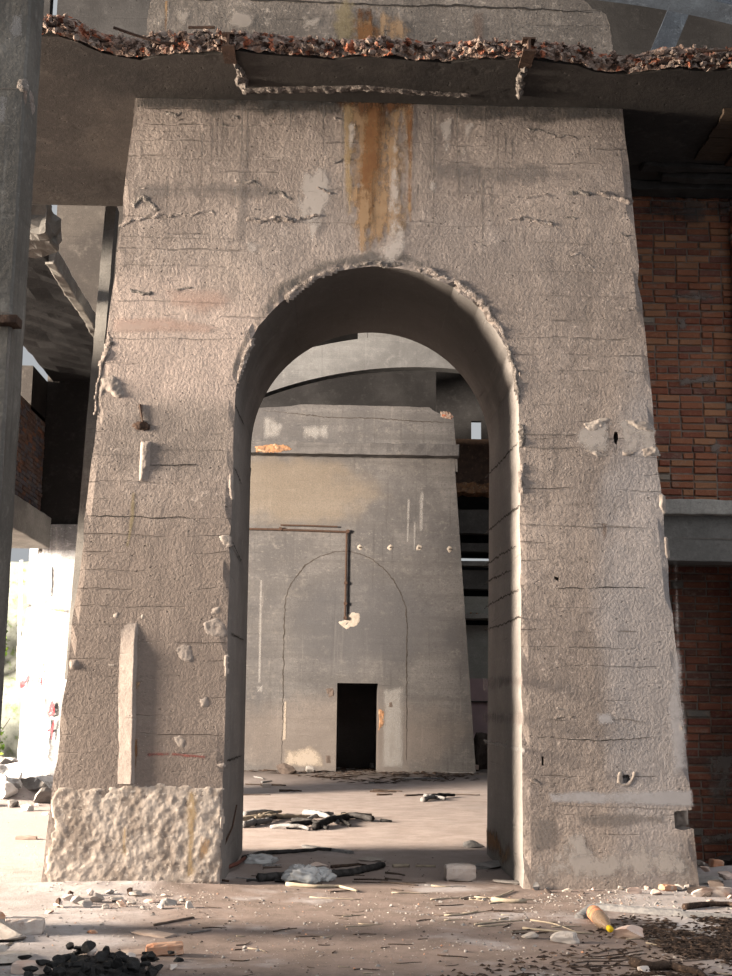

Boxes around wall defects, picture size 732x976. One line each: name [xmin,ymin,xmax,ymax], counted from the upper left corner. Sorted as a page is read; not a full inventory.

rust [335,2,407,40]
spalling [42,13,732,74]
rust [337,102,413,251]
spalling [284,266,340,302]
spalling [352,260,521,404]
spalling [236,338,255,388]
spalling [518,424,526,448]
spalling [578,418,609,457]
spalling [621,420,661,458]
peeling [339,612,360,629]
spalling [617,771,636,786]